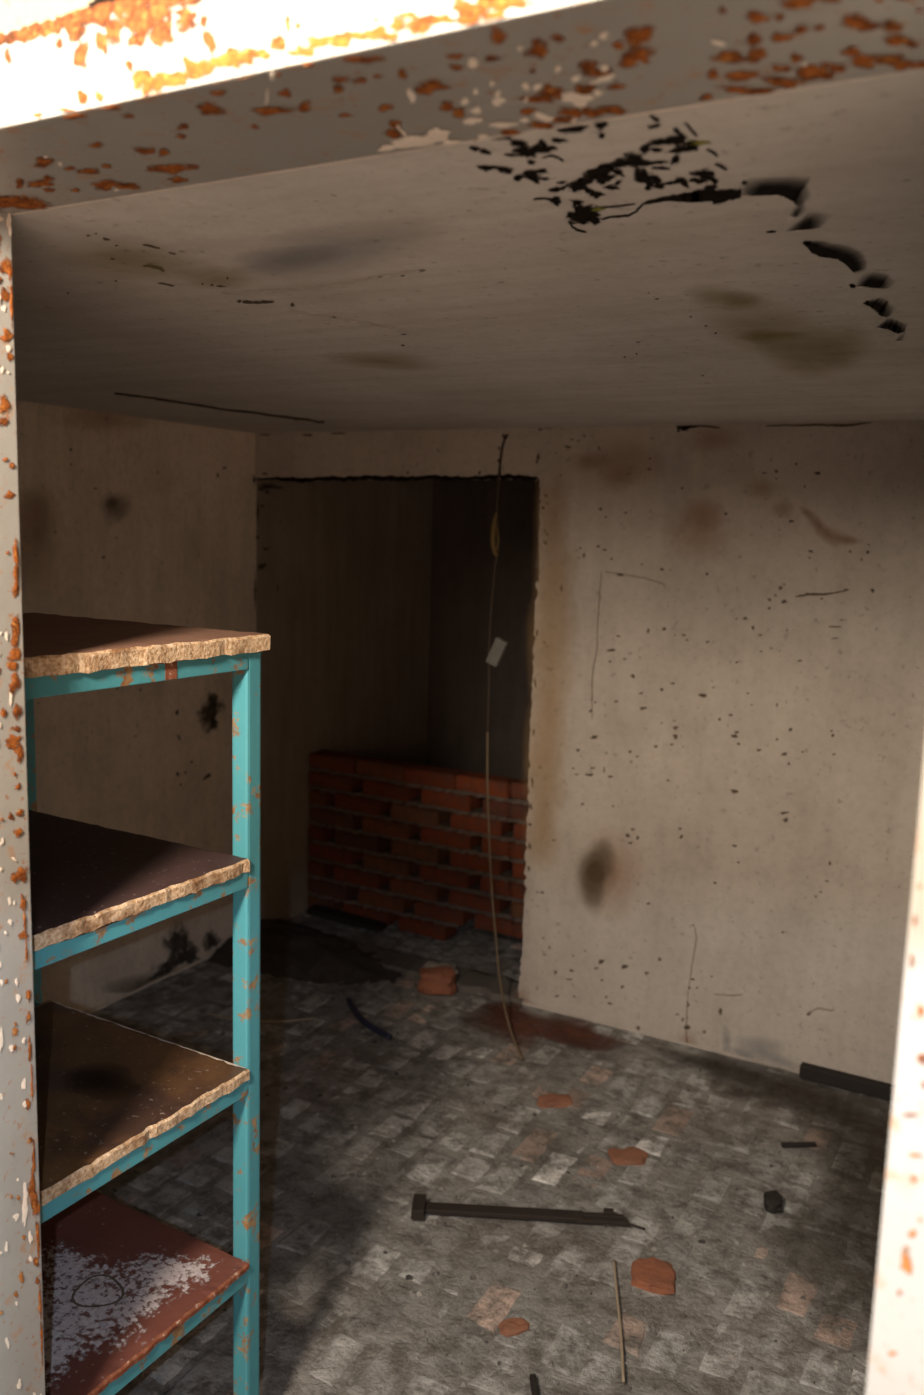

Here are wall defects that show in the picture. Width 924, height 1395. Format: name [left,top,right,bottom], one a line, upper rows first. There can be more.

spalling [460,65,727,233]
peeling [0,213,12,236]
crack [600,181,905,346]
damp [123,927,220,996]
peeling [12,1178,33,1262]